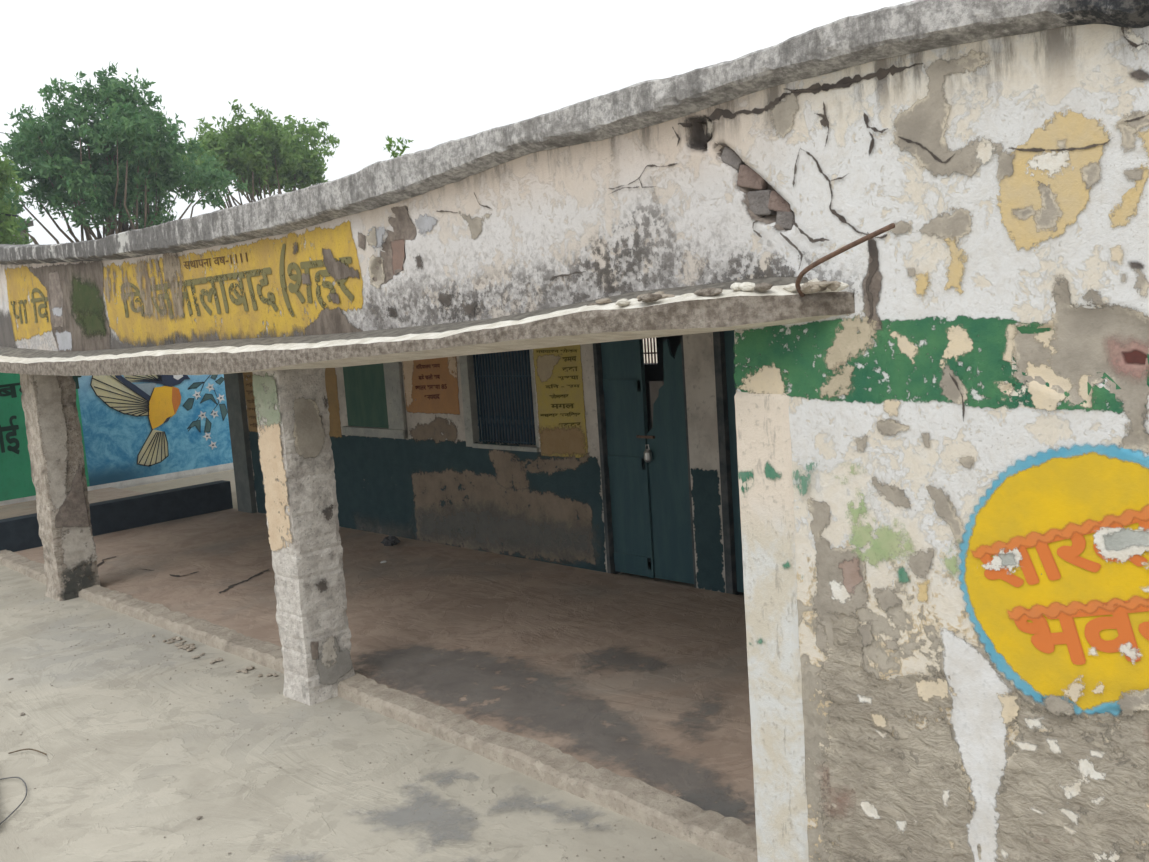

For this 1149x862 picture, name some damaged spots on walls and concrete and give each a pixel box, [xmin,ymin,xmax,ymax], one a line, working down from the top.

crack [1121,27,1149,51]
peeling [29,206,491,352]
leakage [438,292,477,320]
crack [551,272,583,280]
crack [608,63,923,331]
spalling [684,115,973,297]
peeling [939,324,973,421]
peeling [893,50,1149,251]
spalling [994,275,1149,454]
crack [1115,110,1149,133]
peeling [411,449,597,565]
peeling [807,497,1149,862]